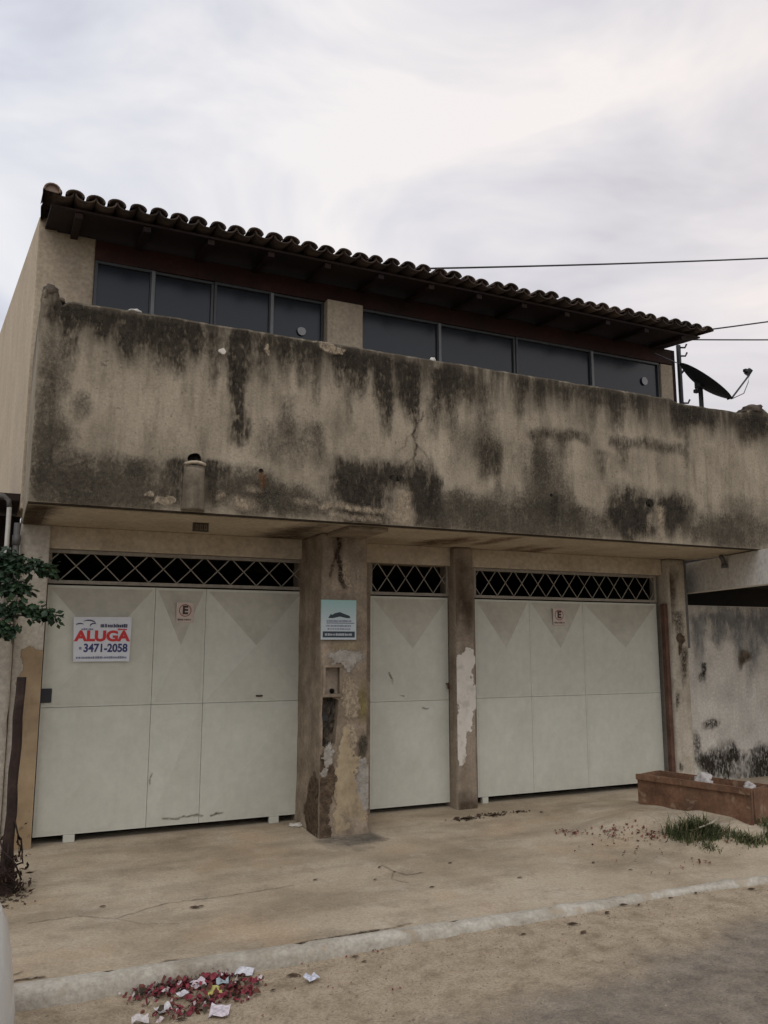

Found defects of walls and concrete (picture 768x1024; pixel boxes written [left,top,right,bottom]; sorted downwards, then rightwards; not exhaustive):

water stain [23,304,768,548]
crack [329,537,346,588]
water stain [694,606,768,678]
peeling [304,649,368,839]
peeling [456,647,476,766]
water stain [693,719,768,779]